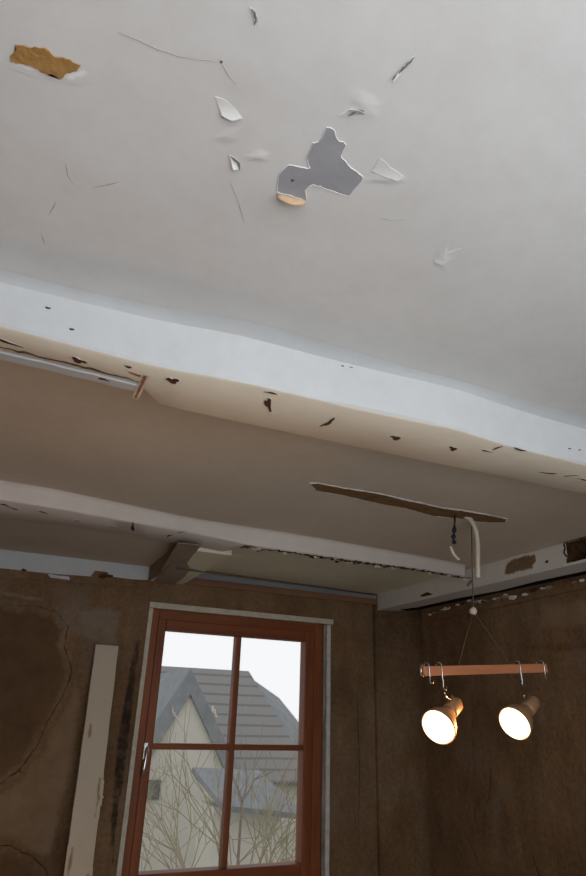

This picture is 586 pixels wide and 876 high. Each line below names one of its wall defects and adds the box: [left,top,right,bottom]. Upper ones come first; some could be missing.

peeling [9,45,96,87]
crack [119,32,235,83]
peeling [340,110,366,118]
peeling [276,127,403,206]
flaking render [263,391,279,412]
flaking render [309,482,508,523]
flaking render [503,552,548,577]
flaking render [428,579,586,621]
damp [105,636,145,876]